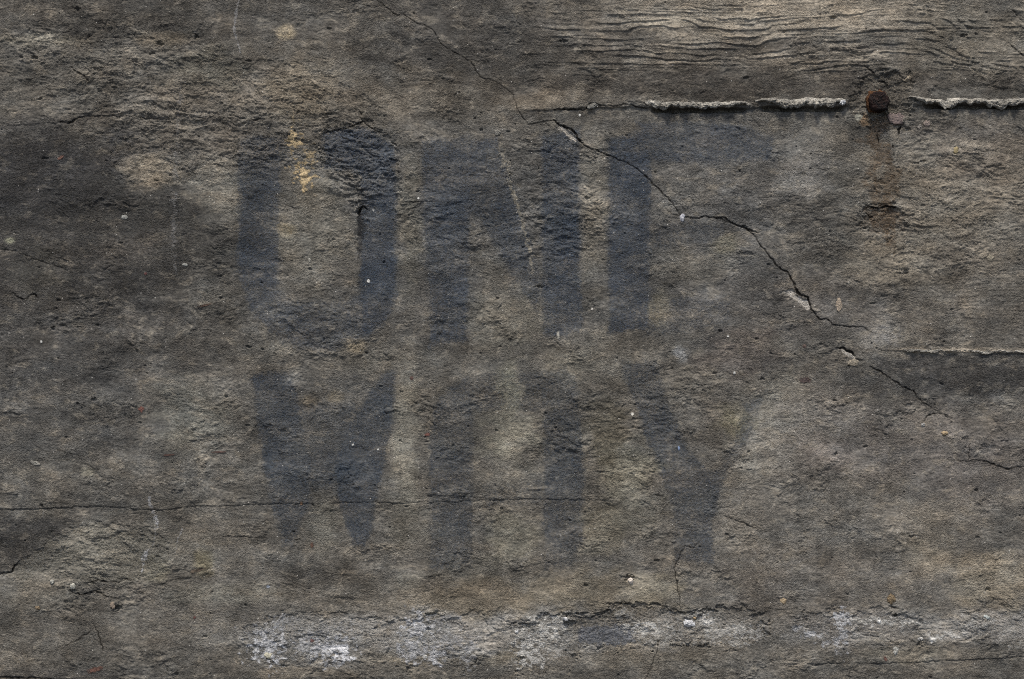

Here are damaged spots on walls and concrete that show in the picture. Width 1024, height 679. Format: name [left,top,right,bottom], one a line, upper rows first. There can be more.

crack [537,103,638,161]
crack [644,175,935,417]
leakage [235,624,362,677]
leakage [390,609,457,668]
leakage [508,611,570,670]
leakage [613,615,674,635]
leakage [693,613,764,643]
leakage [792,606,961,655]